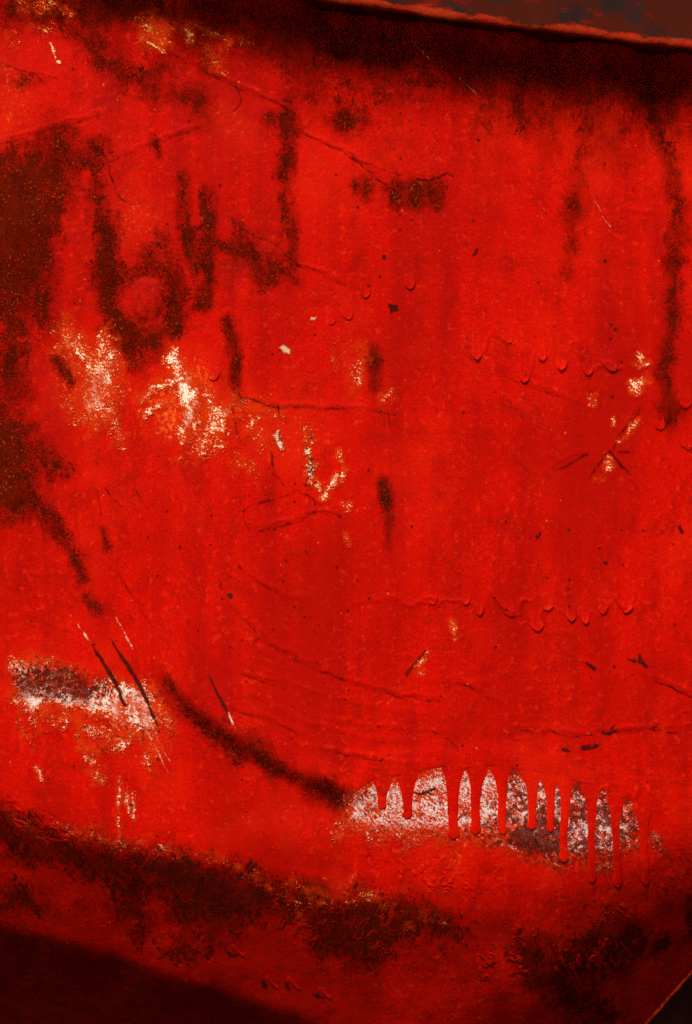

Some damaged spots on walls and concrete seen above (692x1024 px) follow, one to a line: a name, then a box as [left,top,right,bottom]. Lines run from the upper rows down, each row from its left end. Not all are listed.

corrosion [350,175,452,213]
corrosion [0,122,285,614]
peeling [49,313,290,479]
peeling [302,426,347,501]
corrosion [377,477,392,508]
peeling [3,653,184,859]
corrosion [161,675,364,811]
peeling [326,767,664,876]